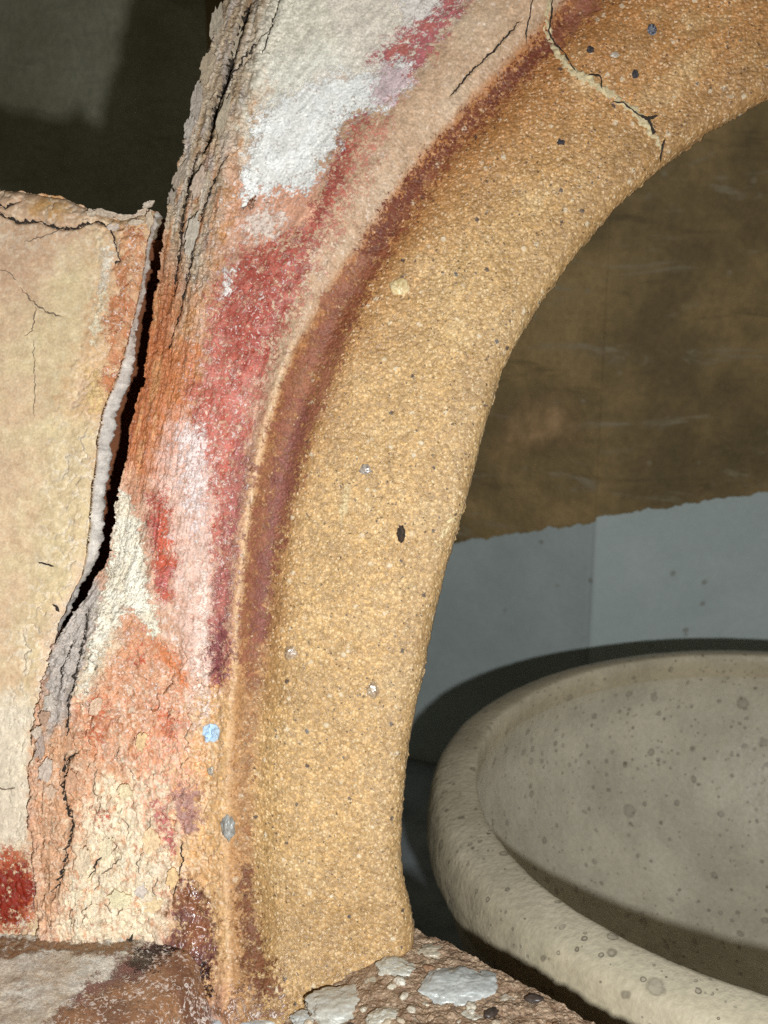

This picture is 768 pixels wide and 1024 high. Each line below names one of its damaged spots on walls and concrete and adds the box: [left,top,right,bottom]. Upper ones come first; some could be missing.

peeling [184,2,243,142]
crack [449,0,666,162]
crack [0,202,121,267]
peeling [219,267,240,300]
water stain [0,0,603,1024]
crack [52,610,184,942]